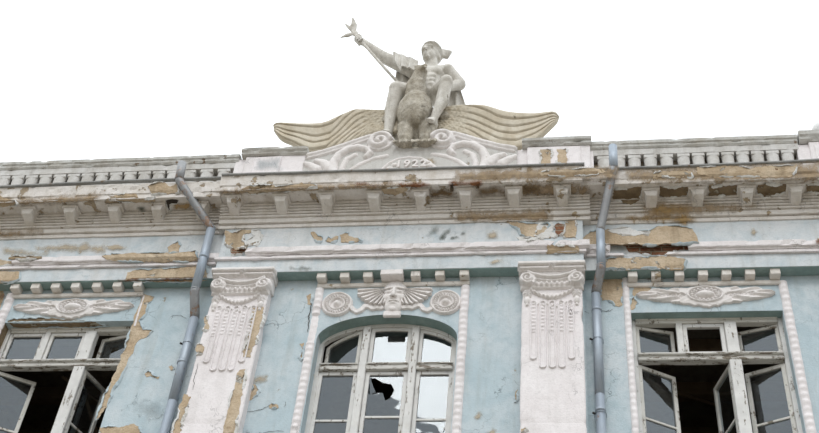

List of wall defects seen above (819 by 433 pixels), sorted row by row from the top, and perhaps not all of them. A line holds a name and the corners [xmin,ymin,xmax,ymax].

peeling [450,148,615,196]
flaking render [0,255,42,308]
flaking render [102,241,209,283]
flaking render [224,229,264,257]
peeling [311,232,363,244]
flaking render [457,163,819,310]
spalling [0,316,109,349]
flaking render [242,307,266,358]
peeling [95,294,154,433]
flaking render [171,394,191,433]
flaking render [223,369,261,433]